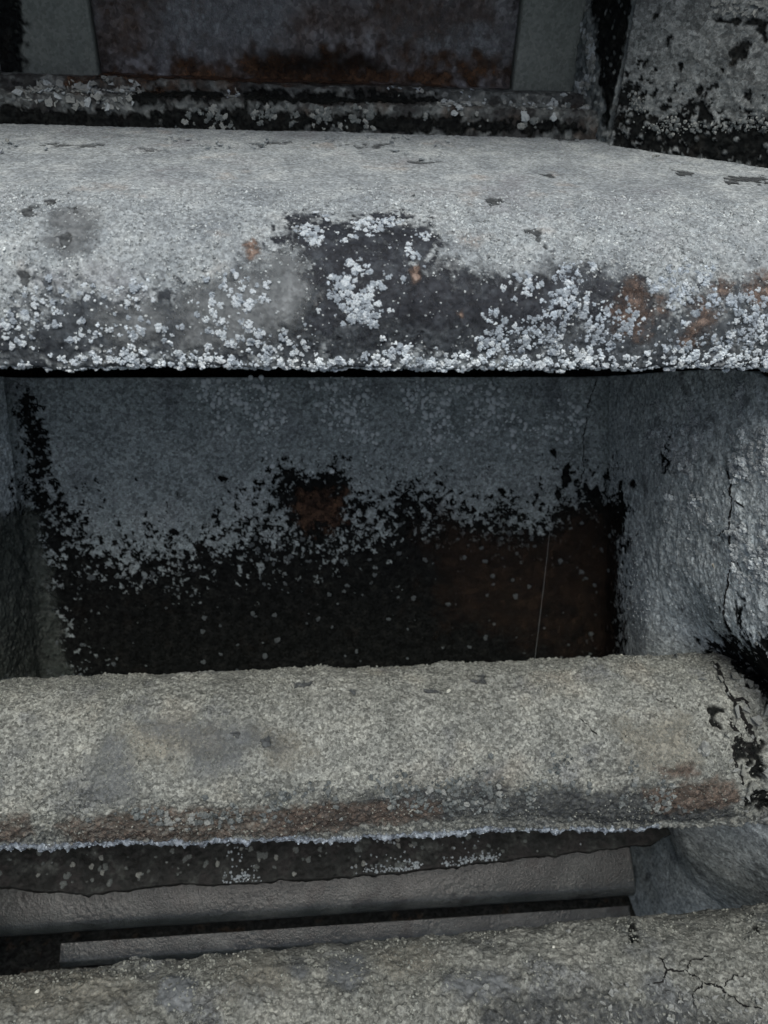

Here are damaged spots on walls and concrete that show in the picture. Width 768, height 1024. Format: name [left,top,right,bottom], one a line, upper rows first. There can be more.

damp [622,86,768,137]
rust [611,277,664,339]
rust [746,273,768,306]
damp [0,205,768,680]
crack [716,467,744,629]
crack [710,661,763,786]
crack [648,955,762,1017]